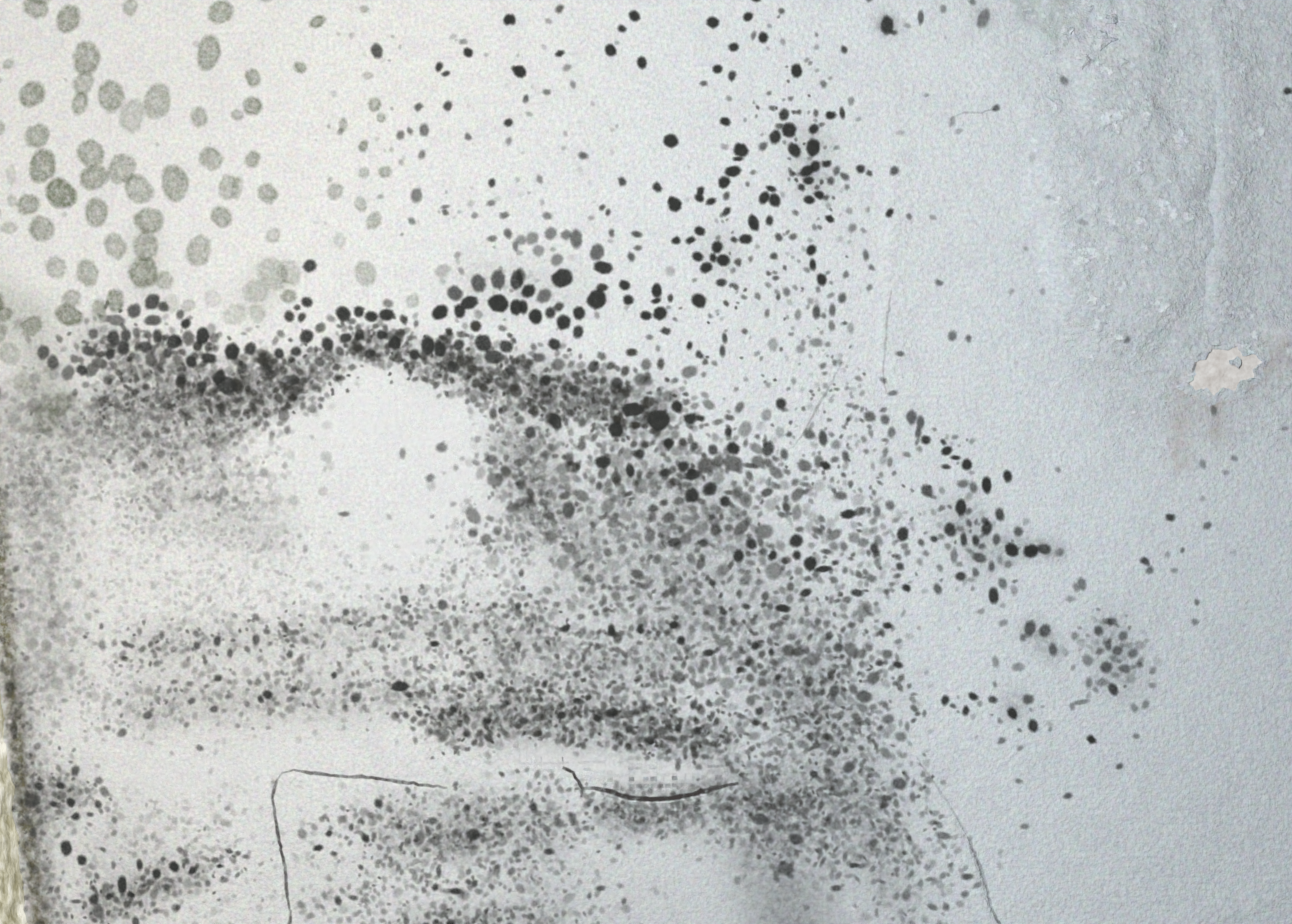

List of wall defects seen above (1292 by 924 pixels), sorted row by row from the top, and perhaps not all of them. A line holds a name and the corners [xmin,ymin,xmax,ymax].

damp [618,11,640,32]
damp [743,0,768,43]
damp [881,16,896,34]
damp [512,66,526,77]
damp [787,64,802,82]
damp [653,98,872,309]
damp [38,205,910,824]
damp [897,411,1050,603]
damp [0,546,106,924]
damp [941,693,1037,732]
damp [137,849,248,894]
damp [71,875,157,924]